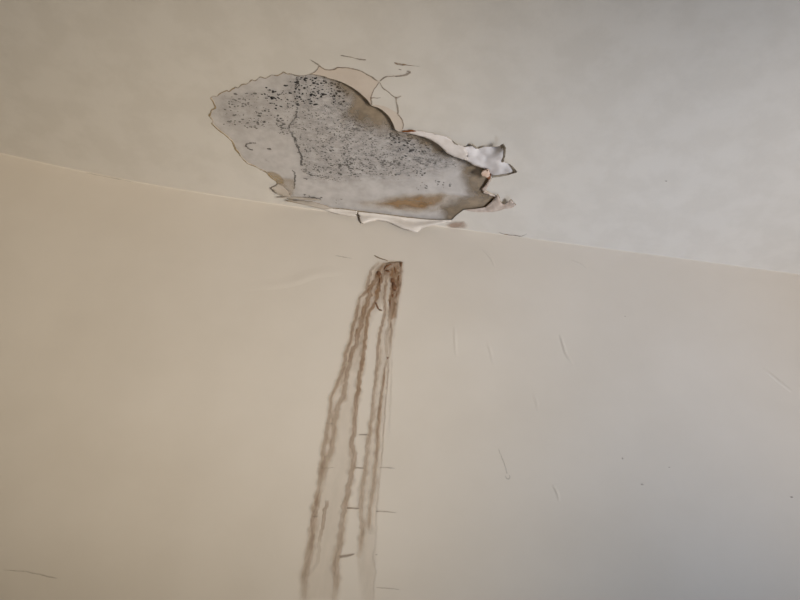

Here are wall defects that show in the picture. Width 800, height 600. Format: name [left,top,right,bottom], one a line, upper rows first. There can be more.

damp [223,76,495,220]
crack [311,55,412,129]
peeling [208,67,517,232]
damp [362,262,402,348]